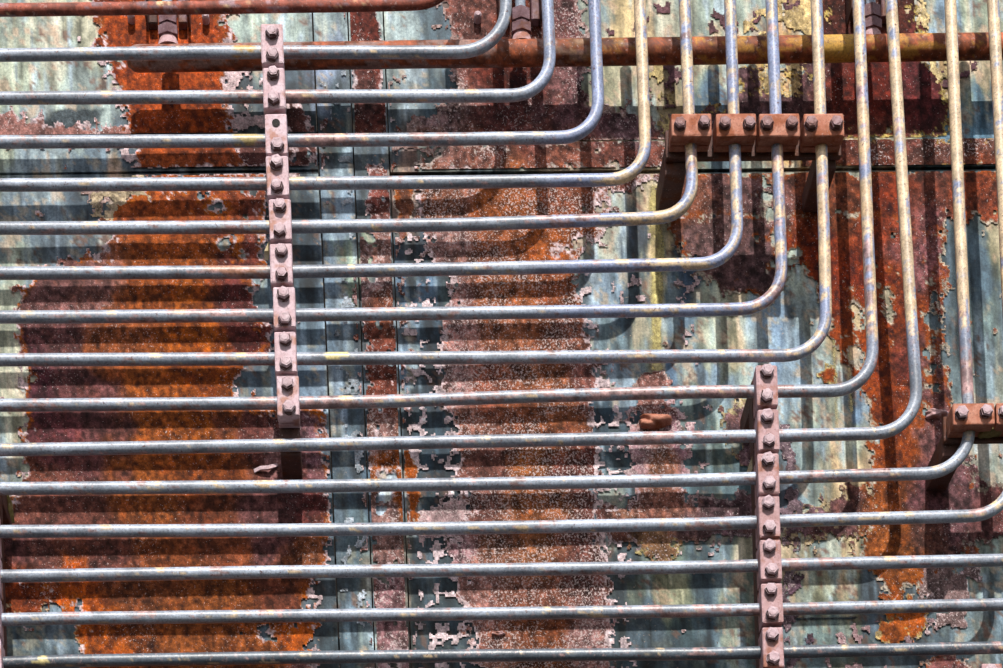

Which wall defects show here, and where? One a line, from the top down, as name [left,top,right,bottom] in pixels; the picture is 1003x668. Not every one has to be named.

rust [115,104,237,134]
rust [347,66,671,190]
rust [665,62,998,471]
peeling [407,406,456,436]
peeling [593,404,623,428]
peeling [408,449,459,475]
rust [780,454,1003,515]
rust [595,487,752,519]
rust [779,510,1003,557]
peeling [417,535,461,564]
peeling [418,577,472,608]
peeling [415,620,478,650]